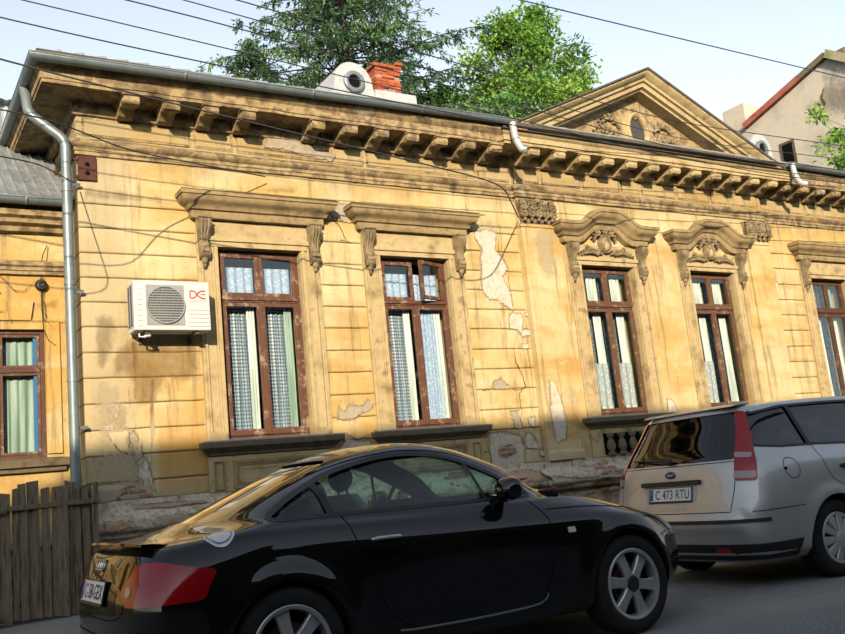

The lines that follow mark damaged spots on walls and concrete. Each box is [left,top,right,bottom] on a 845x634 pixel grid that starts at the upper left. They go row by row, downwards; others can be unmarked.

peeling [474,229,530,349]
flaking render [117,430,210,526]
flaking render [339,434,372,450]
flaking render [337,399,375,421]
flaking render [492,377,511,390]
peeling [548,379,568,444]
flaking render [488,410,632,483]
flaking render [667,399,680,413]